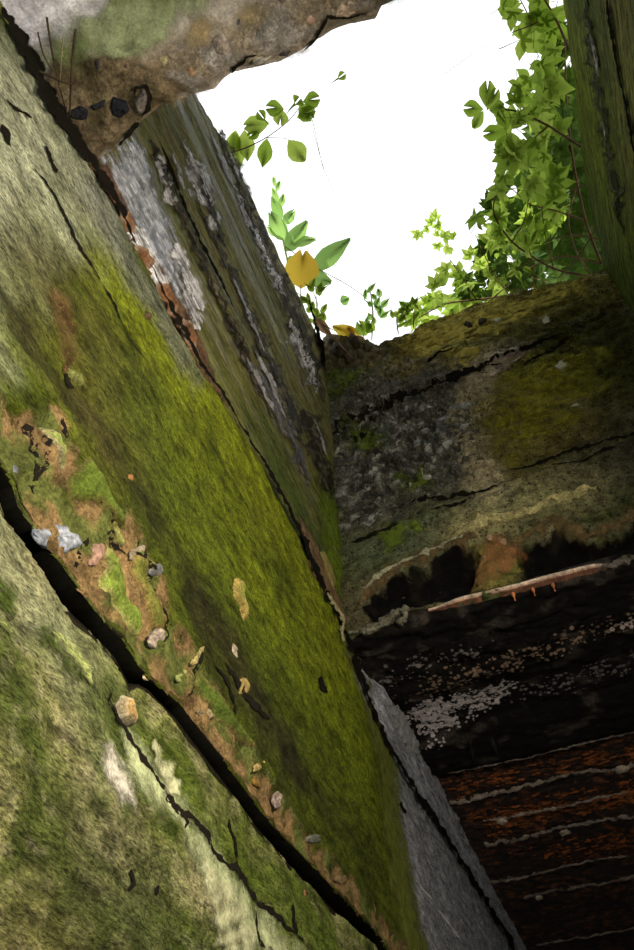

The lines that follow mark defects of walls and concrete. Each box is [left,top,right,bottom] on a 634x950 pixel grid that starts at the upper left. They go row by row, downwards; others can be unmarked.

crack [301,13,367,53]
crack [0,7,136,243]
crack [34,146,145,358]
crack [160,143,237,313]
crack [332,333,573,443]
crack [0,418,387,950]
spalling [0,399,408,950]
crack [150,264,515,950]
crack [351,432,634,543]
spalling [359,507,634,621]
peeling [373,613,634,796]
rust [441,744,634,839]